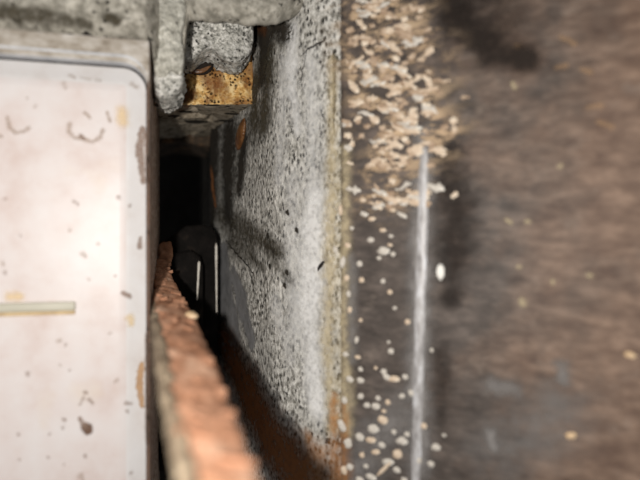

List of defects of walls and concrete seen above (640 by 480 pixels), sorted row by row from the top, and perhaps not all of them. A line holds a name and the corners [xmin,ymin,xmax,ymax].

corrosion [183,75,197,106]
corrosion [136,81,318,480]
crack [225,240,255,296]
damp [203,21,410,480]
damp [438,145,466,280]